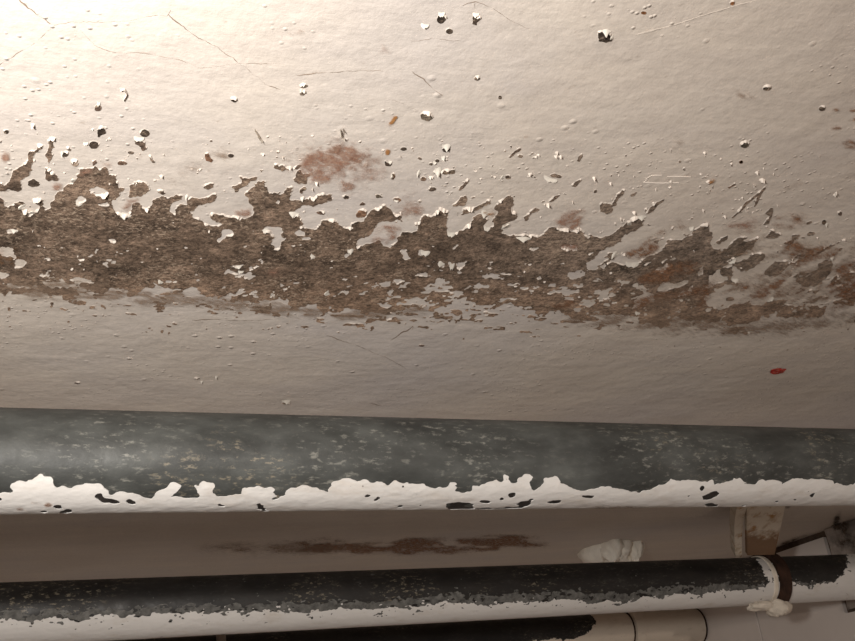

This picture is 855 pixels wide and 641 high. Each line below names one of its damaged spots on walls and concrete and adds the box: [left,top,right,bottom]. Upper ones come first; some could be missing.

peeling [0,123,855,341]
spalling [95,493,136,504]
spalling [447,493,533,509]
spalling [700,486,719,506]
corrosion [270,535,539,555]